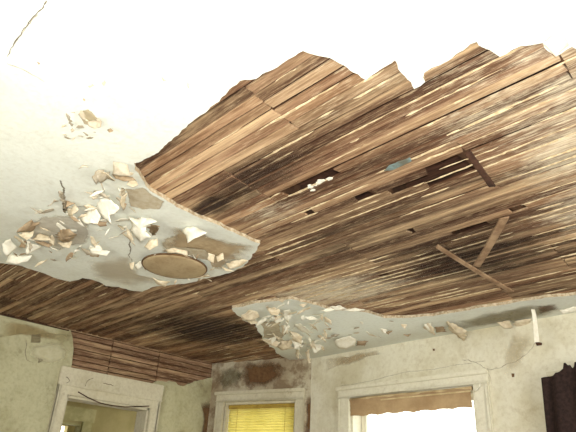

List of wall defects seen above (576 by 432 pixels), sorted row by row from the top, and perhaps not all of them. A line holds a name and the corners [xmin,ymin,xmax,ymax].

crack [7,1,47,82]
flaking render [0,42,576,386]
water stain [471,306,555,325]